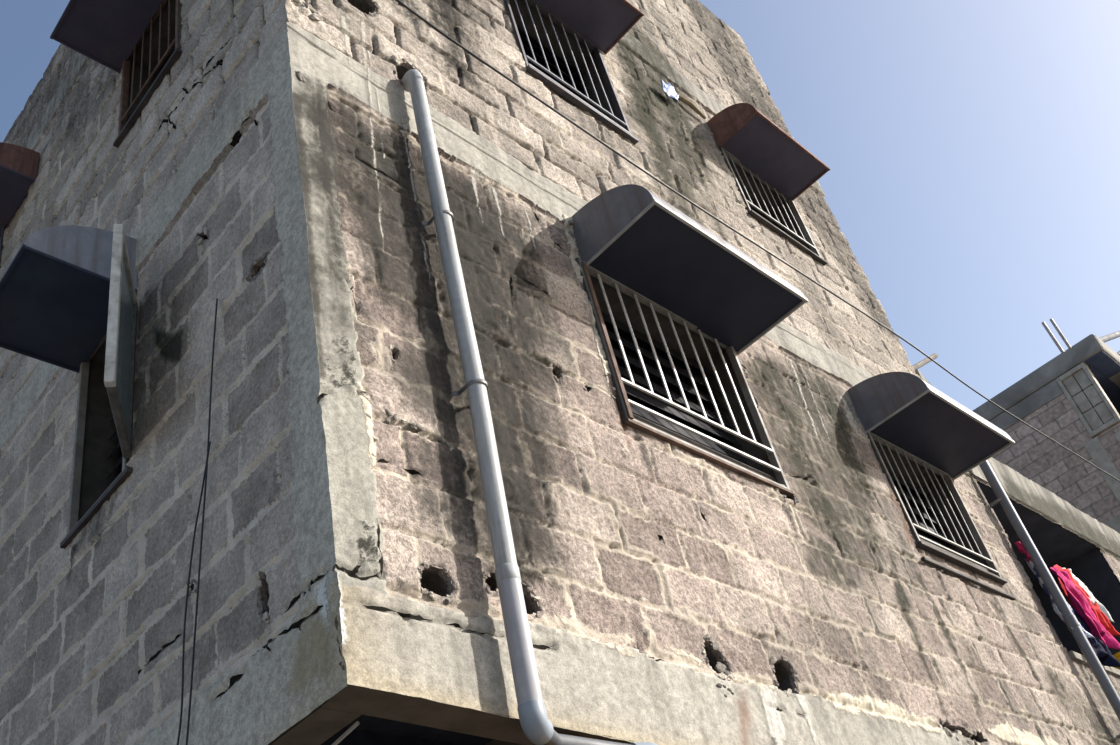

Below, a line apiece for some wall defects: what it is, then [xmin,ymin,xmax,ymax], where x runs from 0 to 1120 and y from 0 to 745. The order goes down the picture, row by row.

spalling [343,0,379,17]
leakage [293,16,466,392]
leakage [442,161,545,582]
leakage [746,355,931,678]
leakage [357,521,381,576]
crack [213,520,504,701]
spalling [415,560,459,604]
spalling [521,577,544,621]
crack [533,643,557,651]
spalling [700,634,736,697]
spalling [769,655,801,697]
leakage [916,573,965,671]